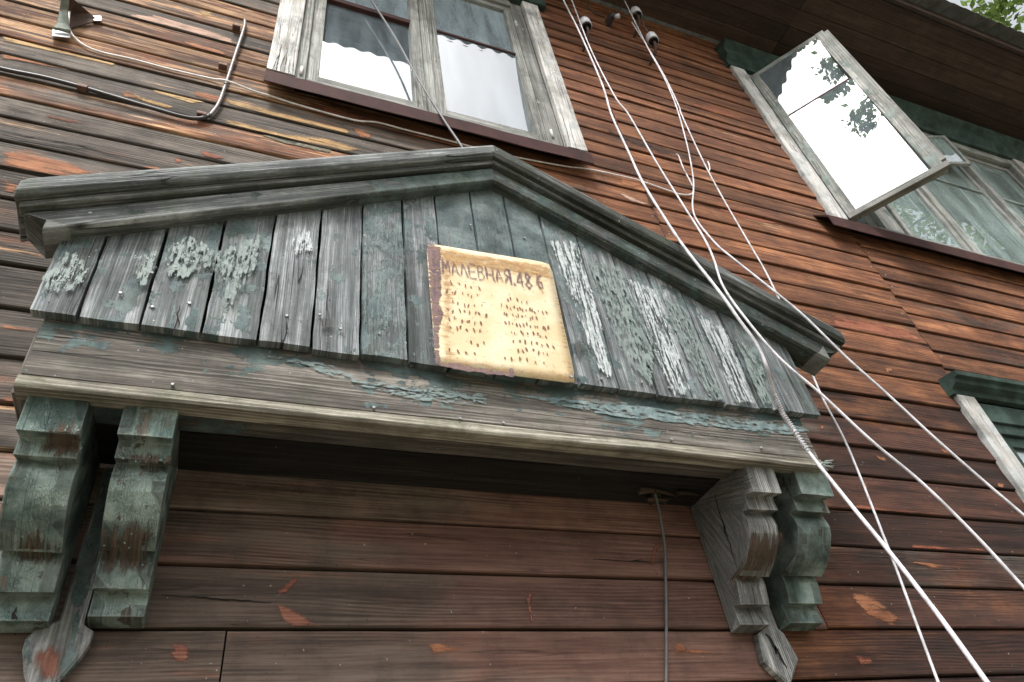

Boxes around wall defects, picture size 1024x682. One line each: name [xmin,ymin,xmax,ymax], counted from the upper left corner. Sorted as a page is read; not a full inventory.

peeling [123,90,396,151]
peeling [4,150,90,175]
peeling [292,231,313,255]
peeling [42,251,89,293]
peeling [132,234,263,308]
peeling [551,240,771,406]
peeling [268,356,487,405]
peeling [511,393,807,435]
peeling [41,421,82,468]
peeling [11,525,57,564]
peeling [102,520,151,578]
crack [714,495,737,567]